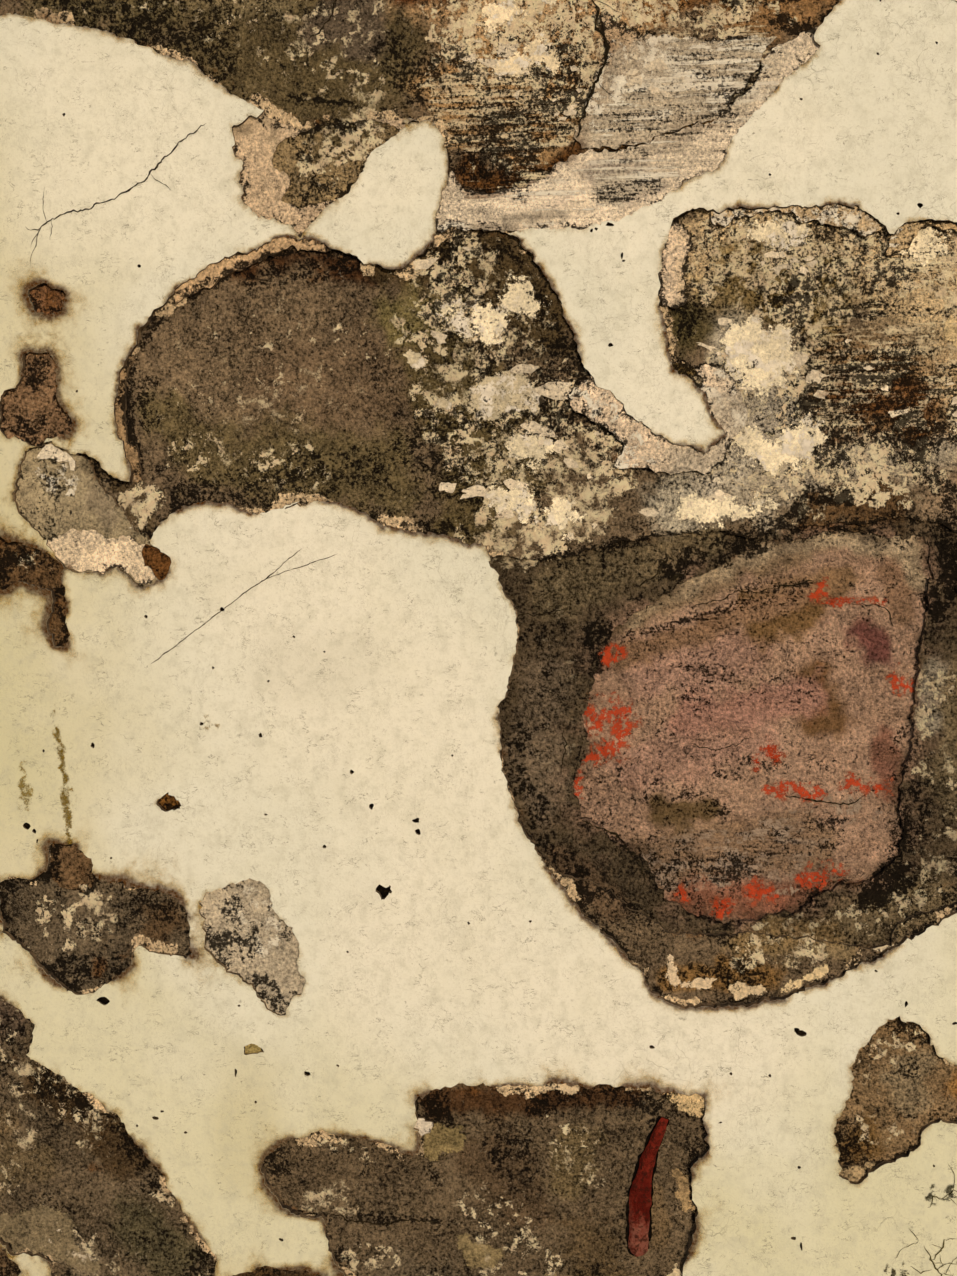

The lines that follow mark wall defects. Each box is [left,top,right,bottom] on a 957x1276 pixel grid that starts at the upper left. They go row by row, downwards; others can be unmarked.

crack [28,124,205,261]
spalling [0,0,957,1015]
spalling [0,995,218,1276]
peeling [245,1044,263,1054]
spalling [233,1076,710,1276]
spalling [834,1001,957,1182]